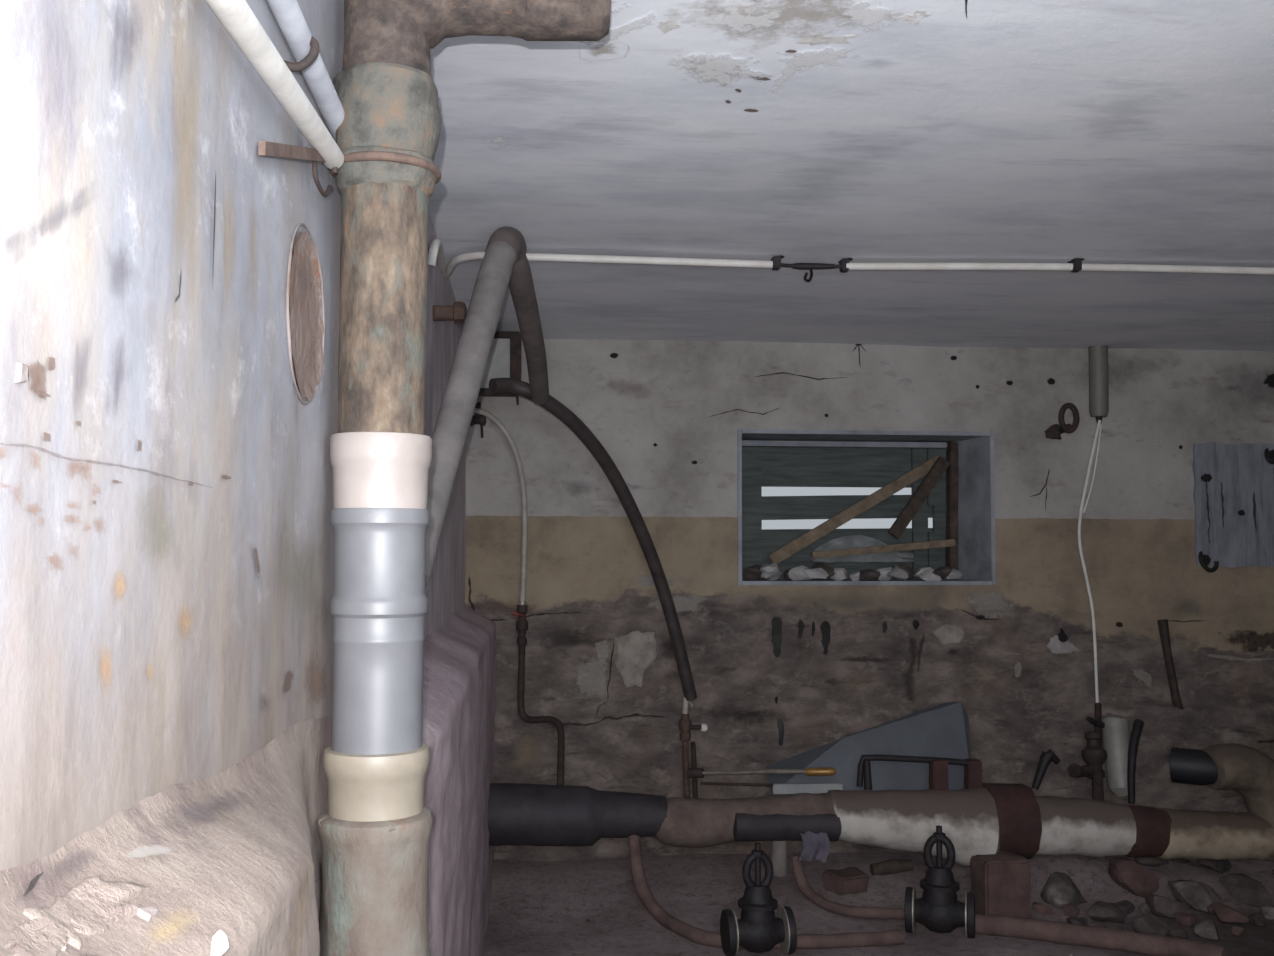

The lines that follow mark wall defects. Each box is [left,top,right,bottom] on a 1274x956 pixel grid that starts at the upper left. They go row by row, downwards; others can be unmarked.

peeling [583,15,681,45]
peeling [674,0,932,103]
peeling [14,357,55,399]
crack [7,444,209,487]
spalling [1047,628,1081,654]
spalling [1207,630,1274,662]
flaking render [576,631,672,697]
spalling [136,907,158,922]
spalling [209,930,229,956]